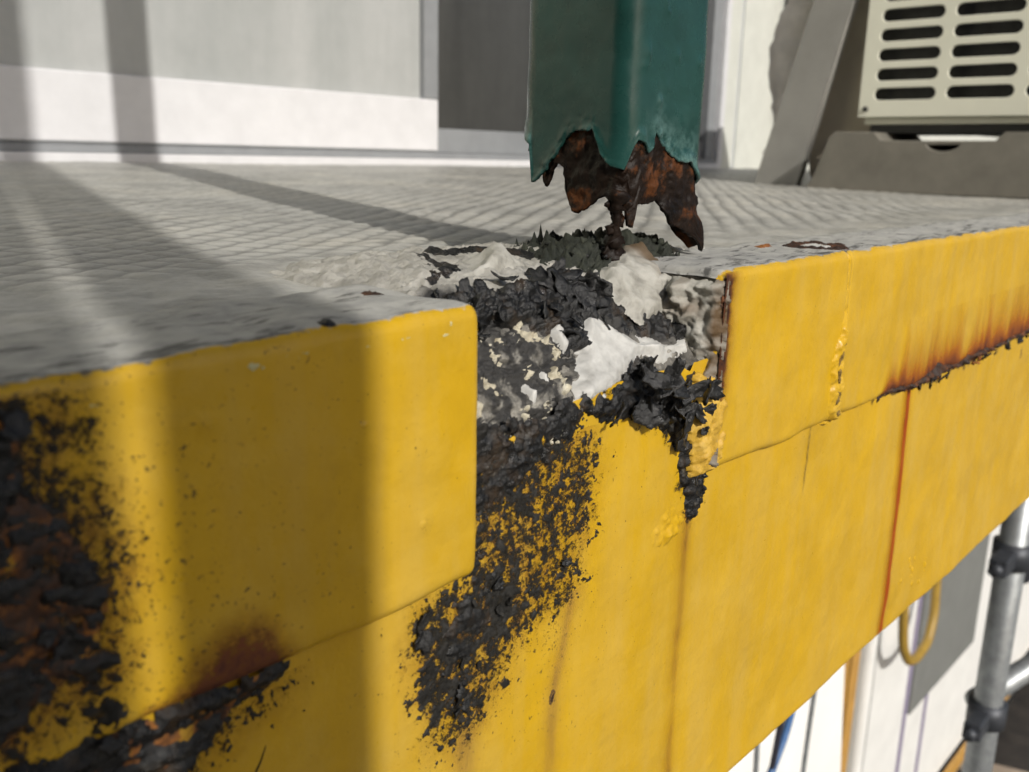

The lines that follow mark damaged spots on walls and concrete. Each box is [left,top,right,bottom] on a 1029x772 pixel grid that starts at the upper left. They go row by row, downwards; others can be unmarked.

corrosion [542,130,704,252]
corrosion [0,388,290,767]
spalling [269,239,731,769]
corrosion [592,272,736,523]
corrosion [876,313,1029,634]